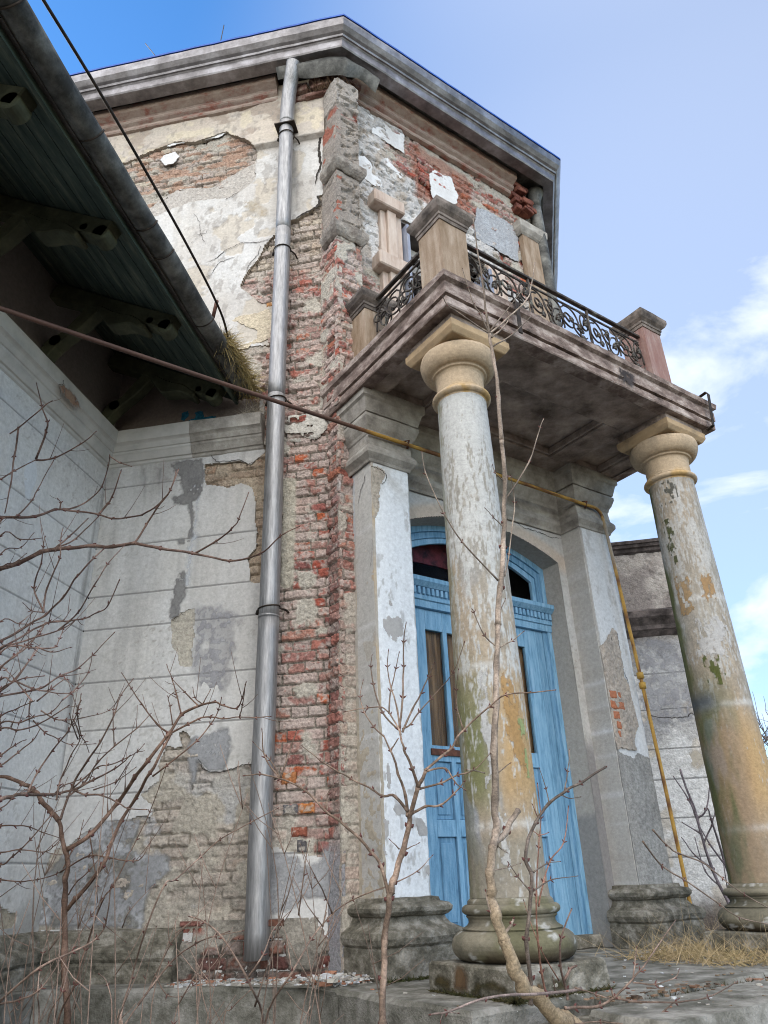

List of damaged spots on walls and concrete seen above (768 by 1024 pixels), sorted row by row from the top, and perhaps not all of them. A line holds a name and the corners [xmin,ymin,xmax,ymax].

spalling [124,133,257,216]
spalling [508,182,537,220]
crack [191,218,273,276]
flaking render [242,237,275,307]
flaking render [205,333,271,583]
leakage [169,459,205,618]
flaking render [272,197,332,857]
leakage [194,607,234,690]
spalling [600,628,639,751]